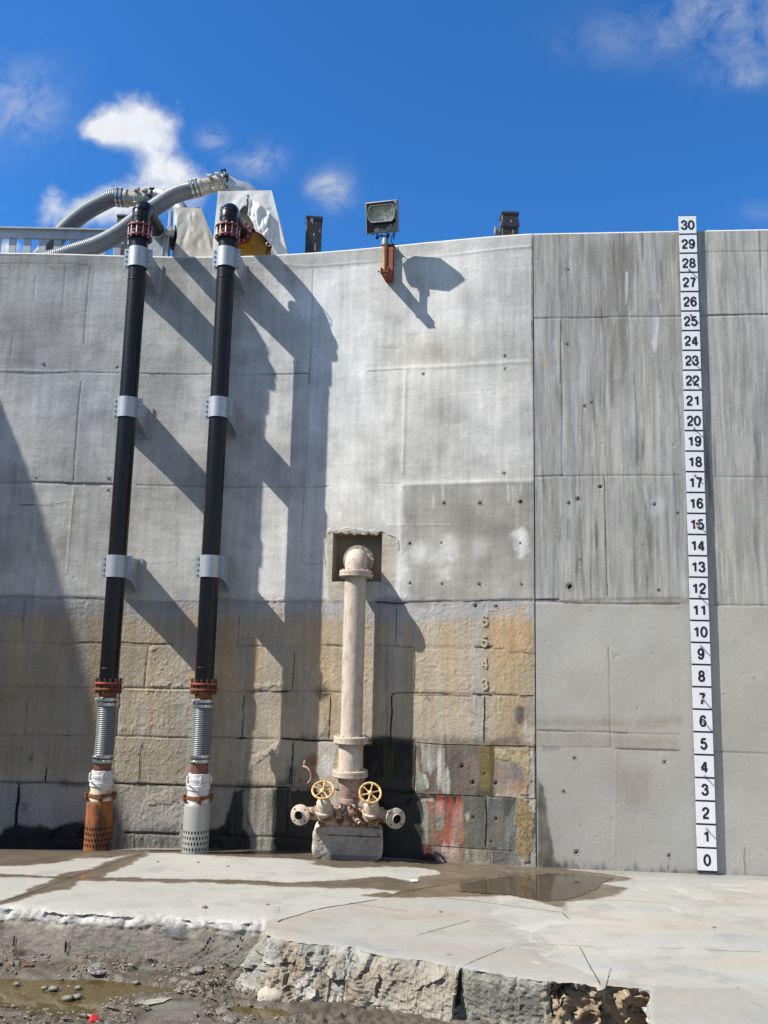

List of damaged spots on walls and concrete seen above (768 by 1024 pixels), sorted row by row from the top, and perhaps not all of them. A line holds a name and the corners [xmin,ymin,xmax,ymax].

water stain [370,308,535,614]
peeling [415,734,480,844]
spalling [491,746,536,864]
spalling [546,983,652,1024]